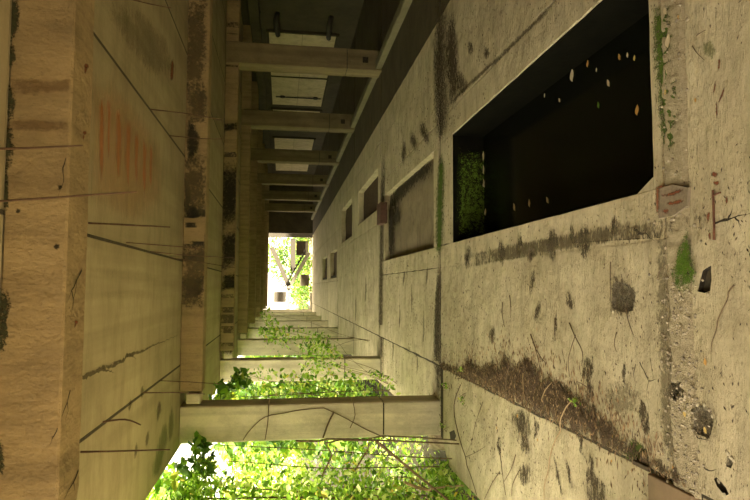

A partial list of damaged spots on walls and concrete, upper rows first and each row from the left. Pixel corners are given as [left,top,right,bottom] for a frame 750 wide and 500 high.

leakage [184,0,207,232]
leakage [402,13,467,163]
rust [655,185,682,213]
rust [707,172,728,240]
leakage [182,240,205,307]
leakage [570,224,589,259]
spalling [695,266,711,297]
crack [51,337,174,442]
leakage [638,400,649,434]
spalling [690,401,716,439]